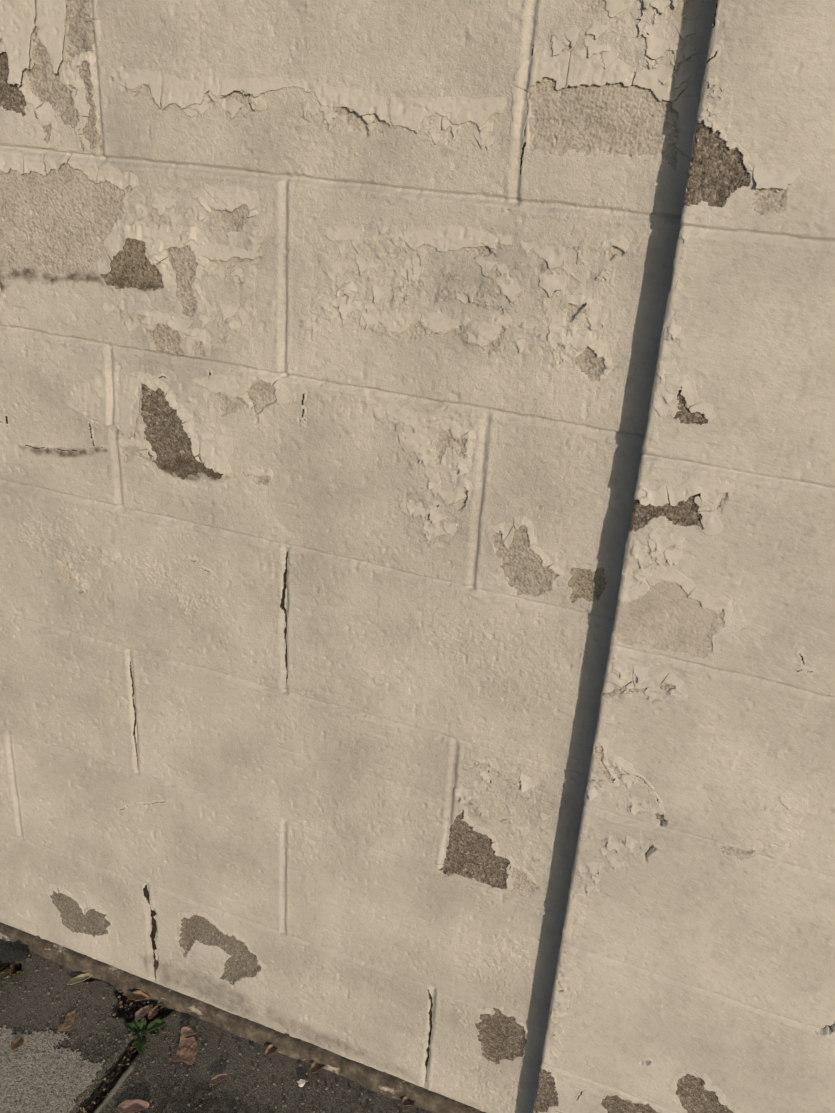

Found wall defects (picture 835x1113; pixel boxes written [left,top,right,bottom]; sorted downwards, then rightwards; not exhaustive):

peeling [109,49,800,215]
peeling [0,0,262,357]
peeling [68,368,274,485]
peeling [629,469,735,536]
peeling [485,515,733,659]
peeling [432,803,543,895]
peeling [43,884,112,937]
peeling [176,909,266,985]
peeling [474,1006,531,1065]
peeling [534,1065,559,1113]
peeling [601,1094,664,1113]
peeling [669,1069,741,1113]